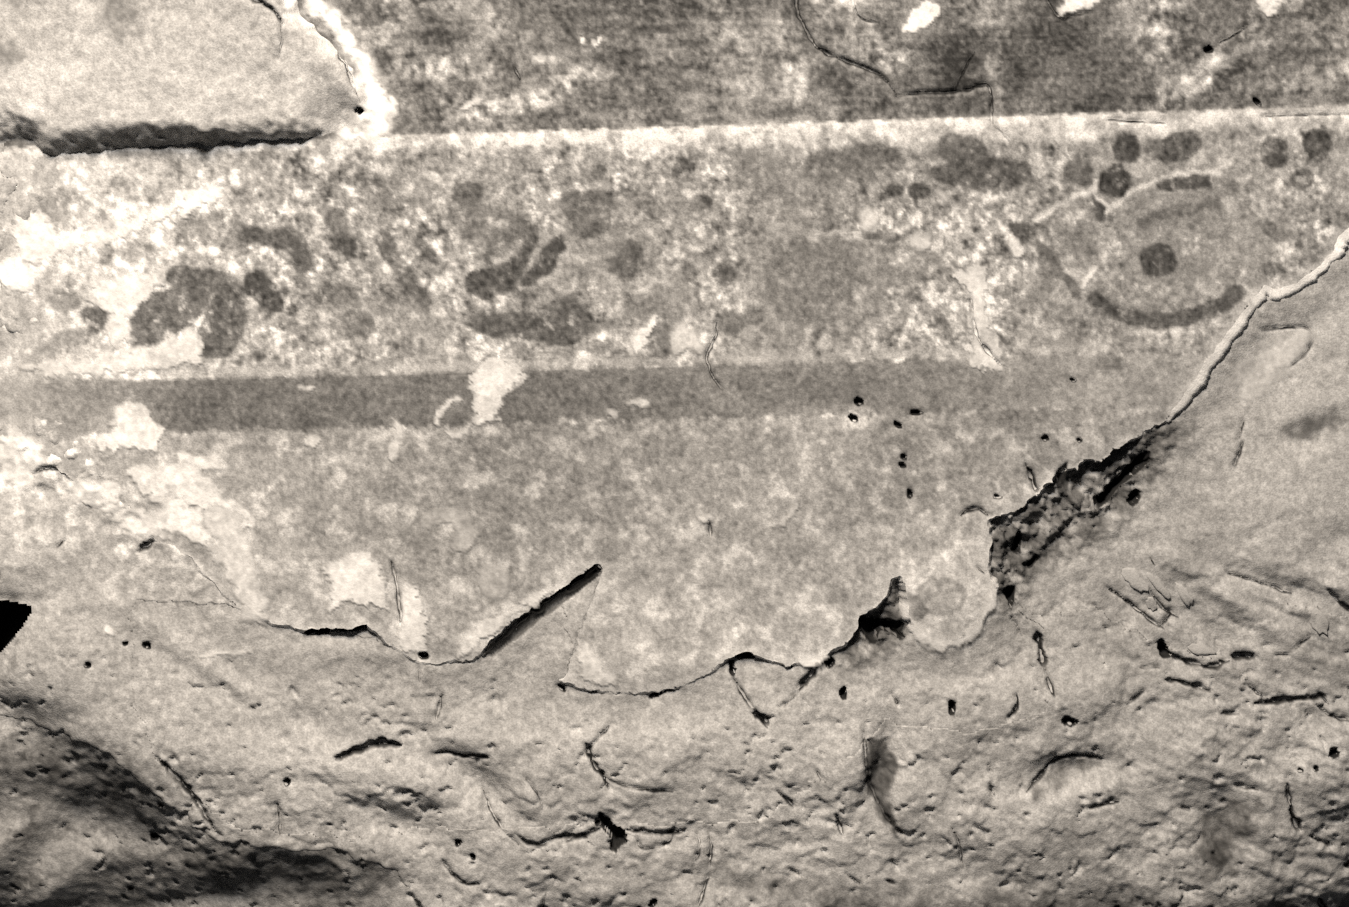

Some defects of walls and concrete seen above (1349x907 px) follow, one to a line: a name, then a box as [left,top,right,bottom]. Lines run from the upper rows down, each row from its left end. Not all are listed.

peeling [0,183,230,294]
peeling [859,207,878,229]
peeling [997,221,1024,257]
crack [1025,463,1067,491]
crack [486,566,599,651]
spalling [0,228,1349,907]